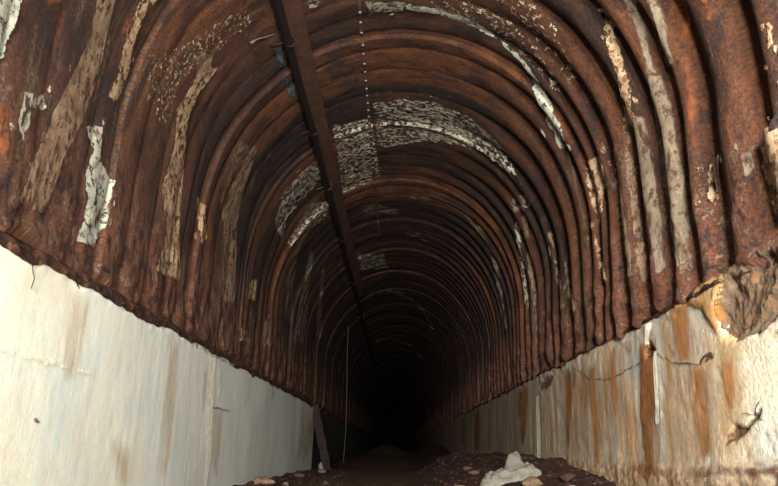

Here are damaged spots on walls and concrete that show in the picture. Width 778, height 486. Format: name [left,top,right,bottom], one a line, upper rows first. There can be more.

peeling [0,0,22,59]
peeling [9,0,115,248]
peeling [333,95,516,192]
peeling [365,0,581,156]
peeling [573,0,720,283]
spalling [714,246,778,342]
corrosion [566,368,601,462]
crack [572,353,713,381]
corrosion [629,341,672,481]
corrosion [665,302,689,443]
corrosion [693,366,710,458]
corrosion [721,465,778,476]